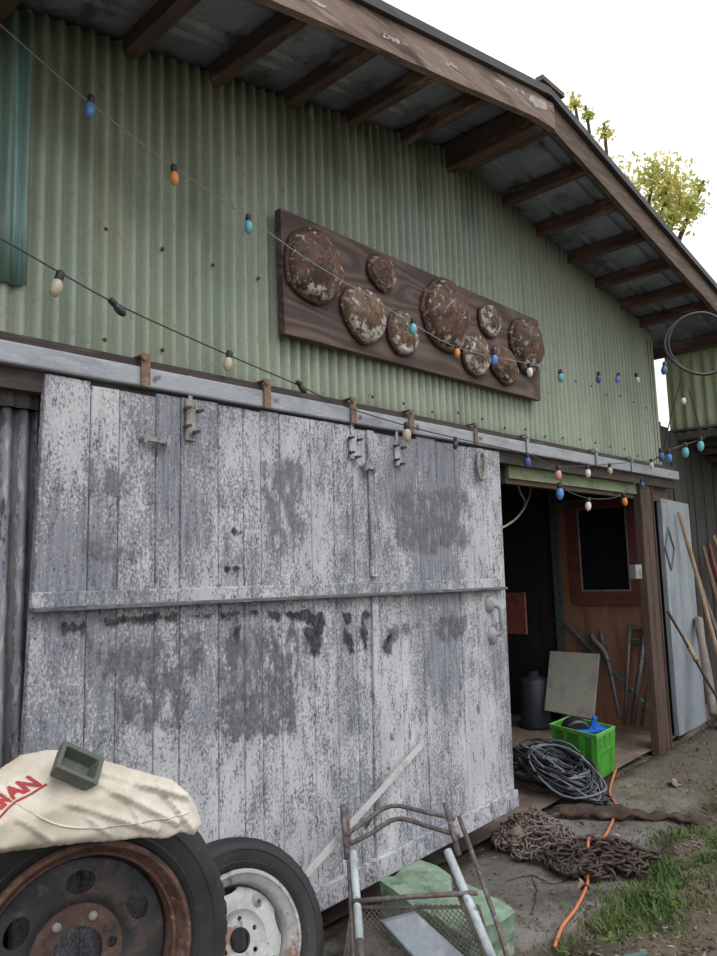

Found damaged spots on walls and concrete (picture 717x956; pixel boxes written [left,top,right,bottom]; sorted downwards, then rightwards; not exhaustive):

peeling [83,455,130,499]
peeling [259,455,311,557]
peeling [391,483,474,557]
peeling [342,608,419,658]
peeling [434,611,468,641]
peeling [57,608,326,748]